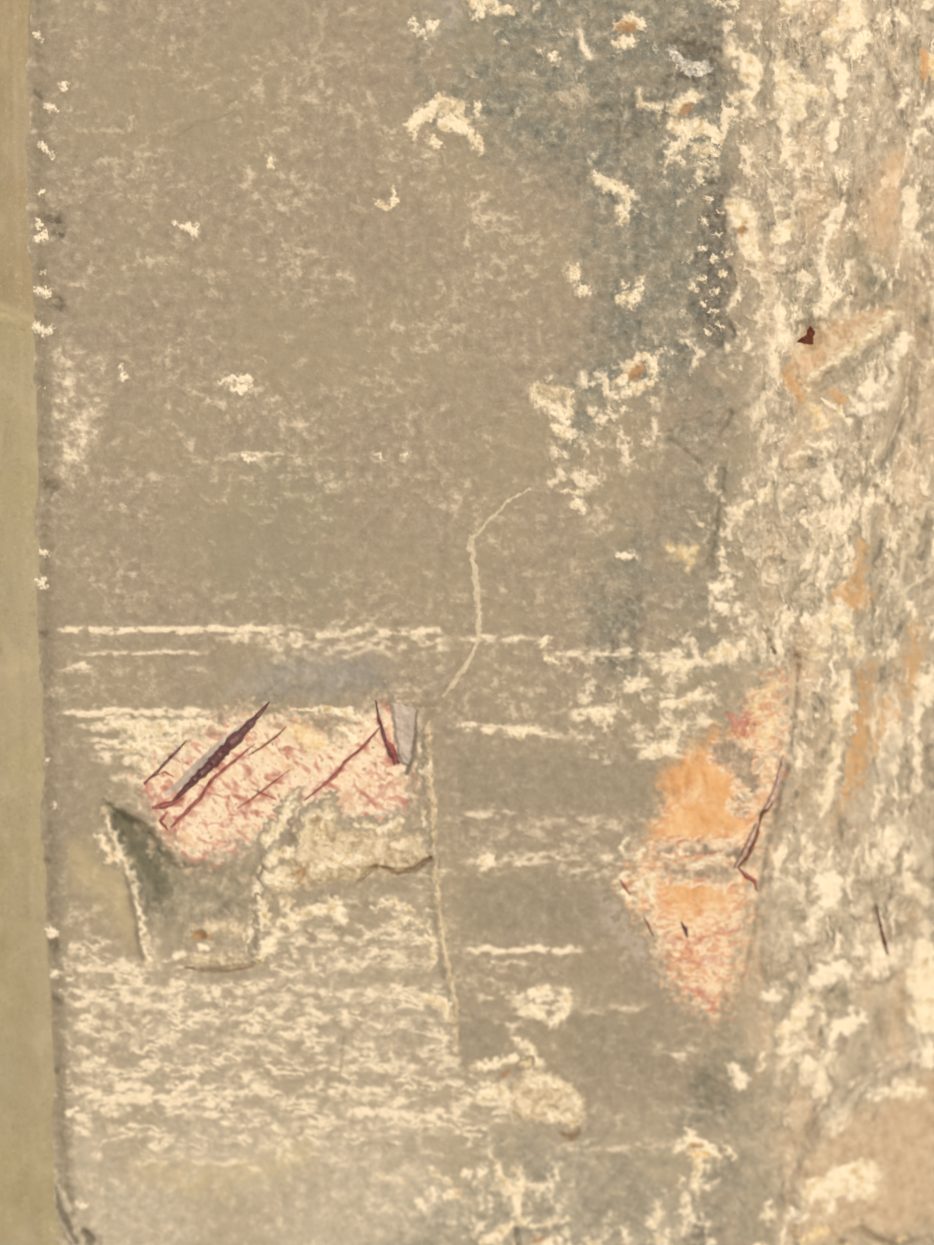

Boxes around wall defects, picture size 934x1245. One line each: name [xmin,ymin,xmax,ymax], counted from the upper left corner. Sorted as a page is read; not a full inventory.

crack [440,486,532,699]
water stain [133,746,299,863]
water stain [208,624,413,819]
peeling [625,651,708,763]
water stain [705,731,770,822]
peeling [733,754,767,811]
spalling [89,790,278,975]
peeling [610,834,724,906]
water stain [582,872,747,1021]
water stain [674,1049,740,1129]
water stain [110,1118,337,1219]
crack [859,1226,908,1245]